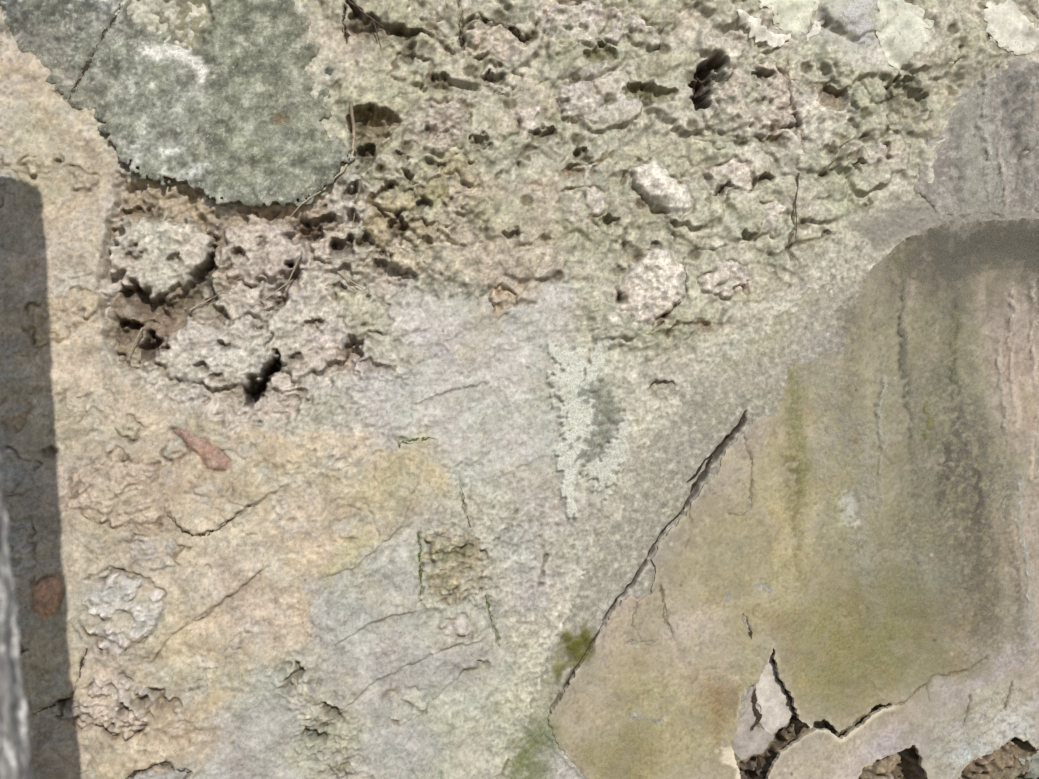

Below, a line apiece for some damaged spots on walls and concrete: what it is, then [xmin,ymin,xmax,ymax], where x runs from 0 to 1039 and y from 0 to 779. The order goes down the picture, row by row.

crack [67,4,121,101]
peeling [0,0,495,427]
spalling [481,68,509,95]
spalling [499,225,524,247]
spalling [528,123,559,147]
spalling [571,141,739,336]
spalling [738,229,760,244]
spalling [678,0,868,188]
damp [899,292,1034,635]
crack [562,410,753,691]
peeling [548,615,1039,779]
crack [896,655,988,705]